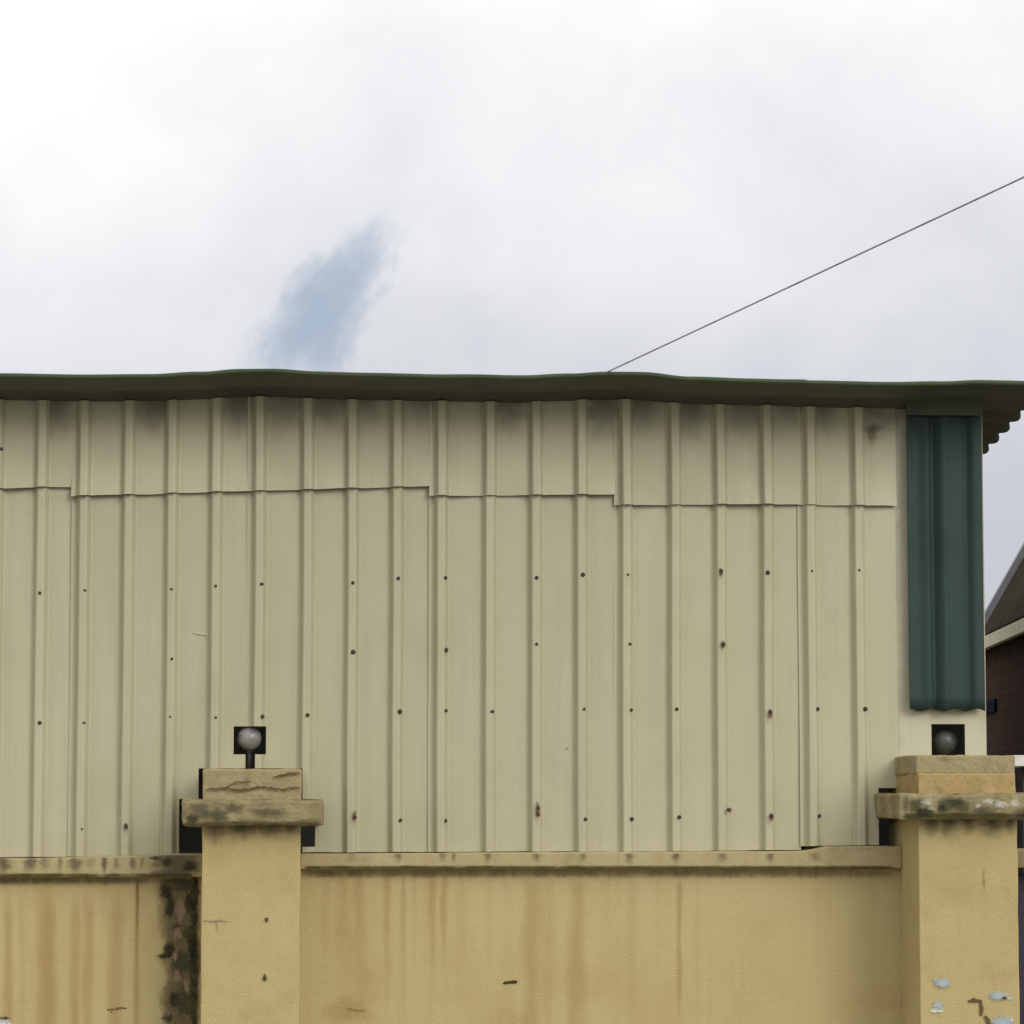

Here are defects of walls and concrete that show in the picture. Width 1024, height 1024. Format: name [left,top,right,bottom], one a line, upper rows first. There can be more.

damp [187,805,318,831]
damp [904,798,1024,825]
damp [0,855,201,1024]
peeling [933,978,951,987]
peeling [989,992,1012,1000]
peeling [992,1016,1014,1024]